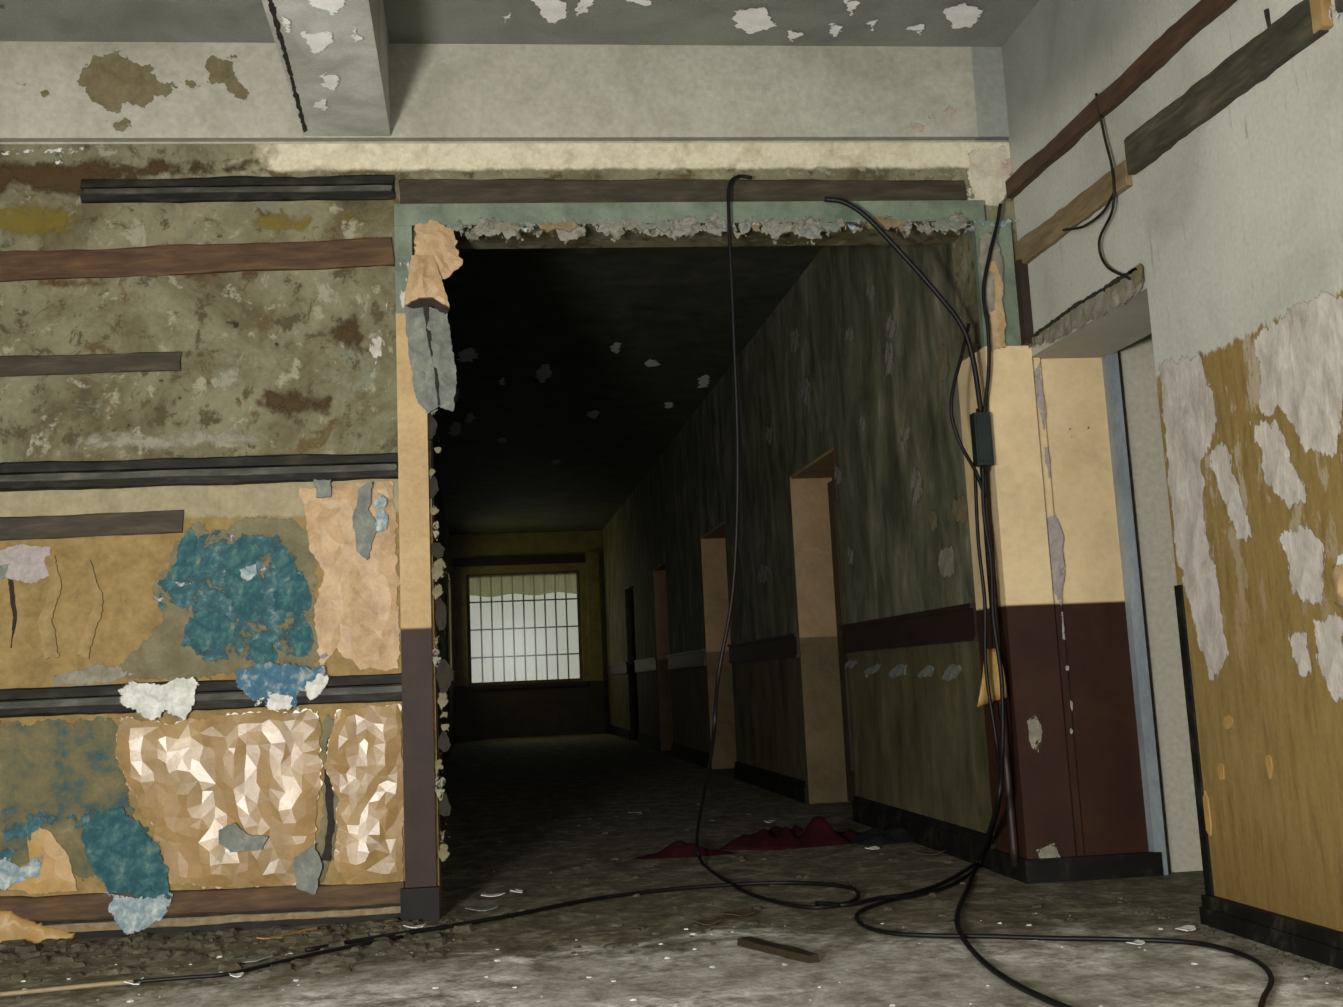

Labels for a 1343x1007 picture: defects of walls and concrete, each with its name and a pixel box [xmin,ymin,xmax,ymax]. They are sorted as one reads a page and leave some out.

peeling [531,0,593,23]
peeling [732,7,804,42]
peeling [943,3,983,29]
water stain [0,159,256,236]
peeling [386,146,1019,453]
peeling [1250,291,1343,510]
peeling [352,481,389,560]
peeling [1158,351,1253,681]
peeling [0,515,329,935]
spalling [428,469,454,816]
peeling [1279,522,1343,703]
peeling [0,911,75,943]